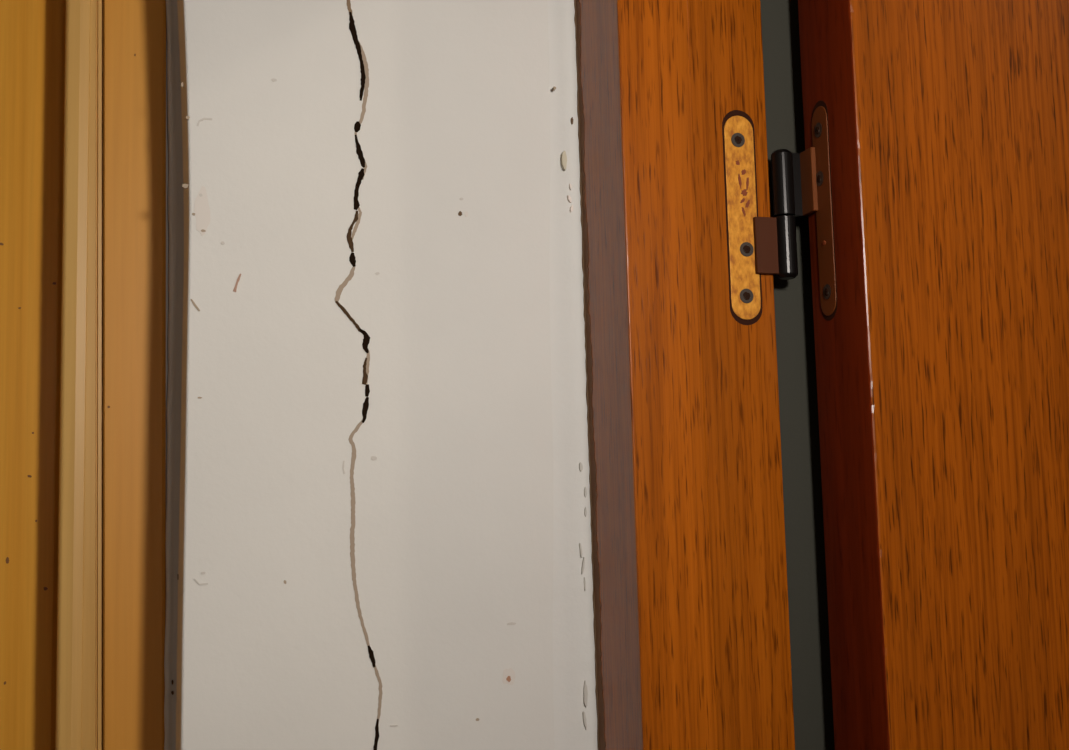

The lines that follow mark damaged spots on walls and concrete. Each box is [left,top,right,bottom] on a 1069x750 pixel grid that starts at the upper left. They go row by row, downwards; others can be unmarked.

crack [335,0,383,750]